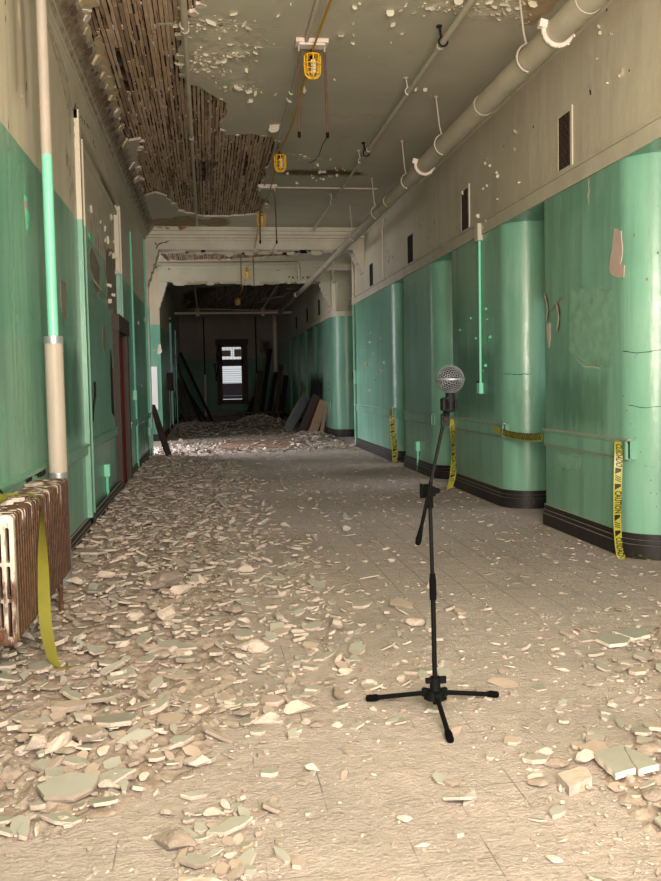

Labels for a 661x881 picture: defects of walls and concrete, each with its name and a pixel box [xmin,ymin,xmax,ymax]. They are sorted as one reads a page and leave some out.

peeling [386,0,559,35]
spalling [56,0,361,230]
peeling [88,233,119,314]
spalling [171,270,309,311]
spalling [155,250,335,270]
peeling [609,228,625,278]